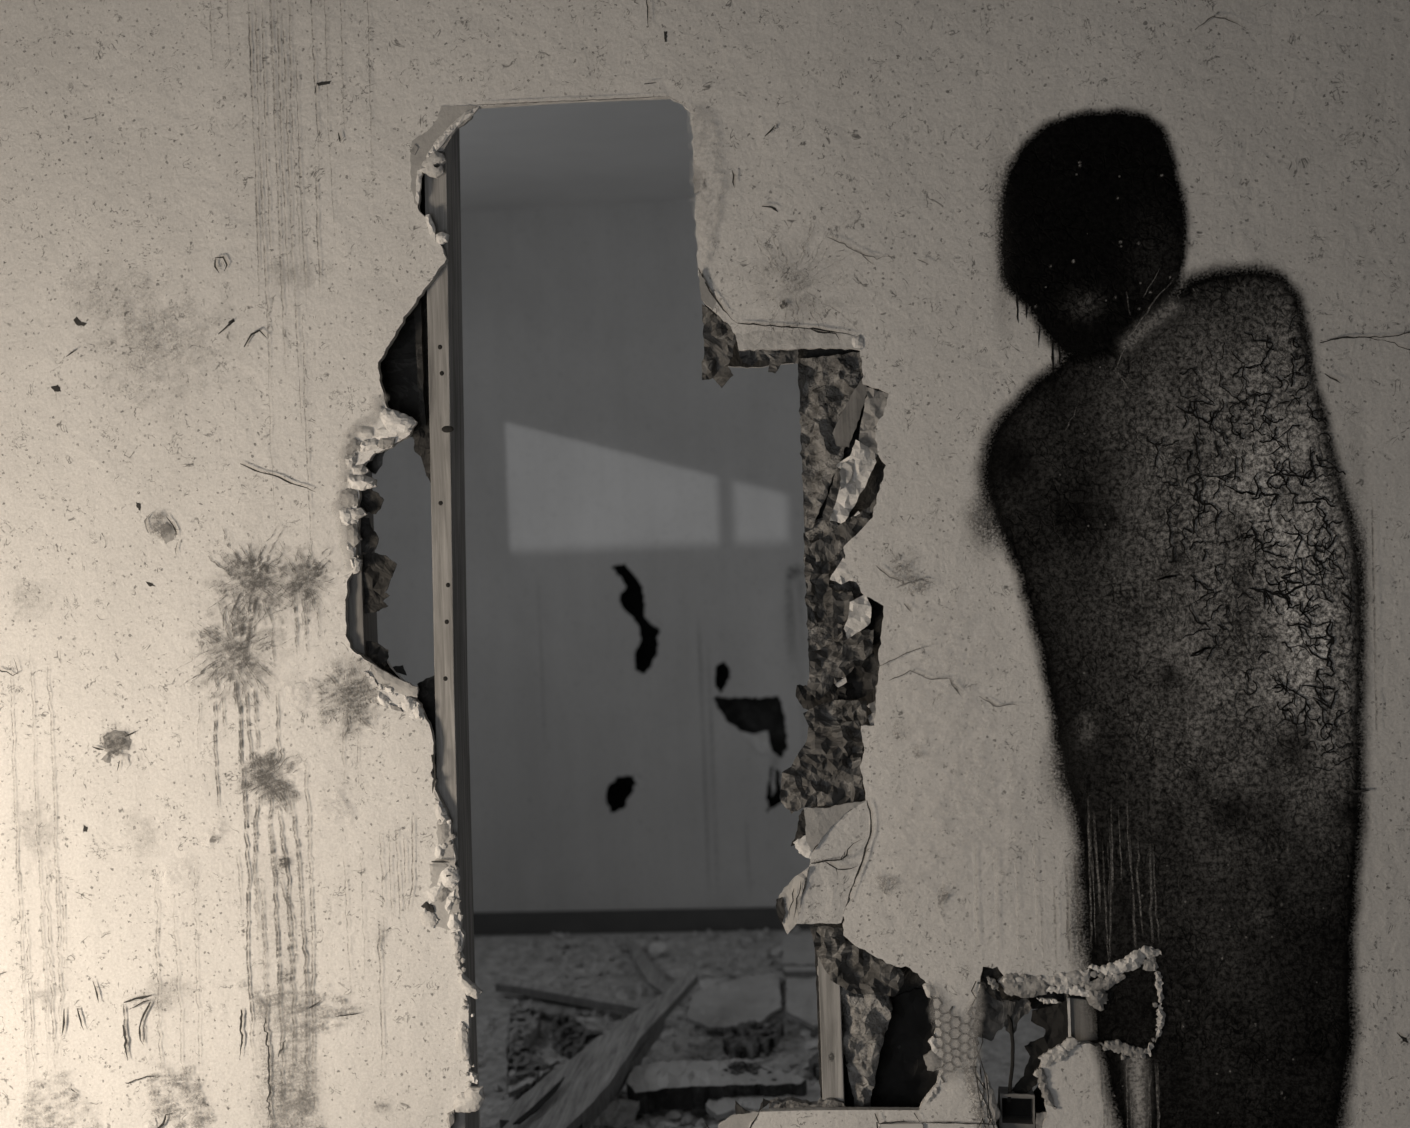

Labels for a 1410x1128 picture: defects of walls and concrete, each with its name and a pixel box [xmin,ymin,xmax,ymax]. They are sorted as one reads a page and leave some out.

damp [248,0,342,338]
spalling [410,105,480,245]
spalling [736,323,863,350]
spalling [332,398,418,574]
spalling [358,659,425,720]
damp [192,530,377,1128]
damp [380,824,413,906]
peeling [793,835,814,859]
spalling [419,755,485,1128]
spalling [922,945,1166,1128]
peeling [705,1098,770,1128]